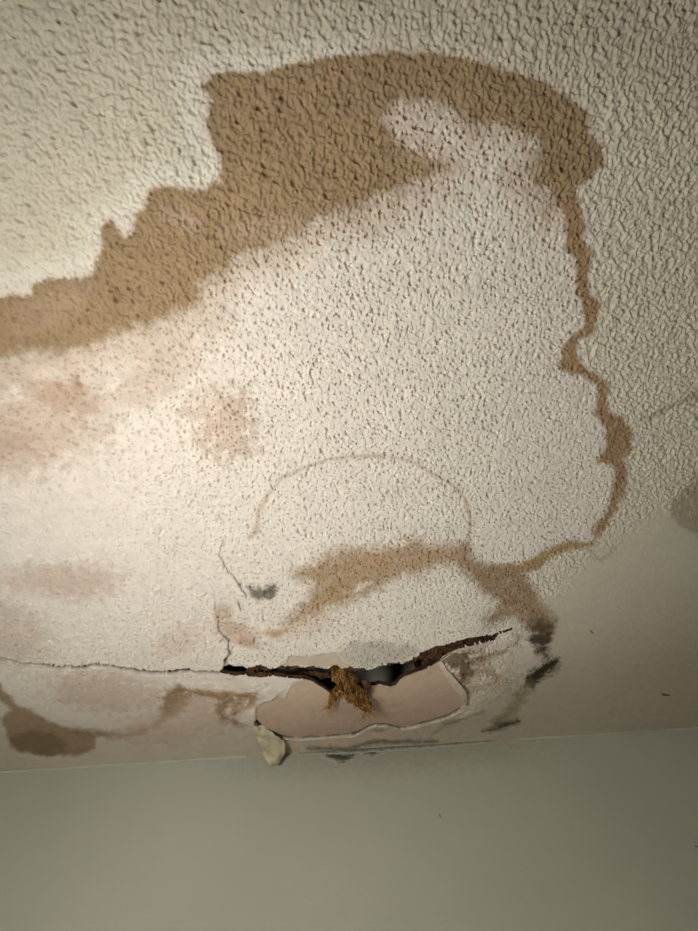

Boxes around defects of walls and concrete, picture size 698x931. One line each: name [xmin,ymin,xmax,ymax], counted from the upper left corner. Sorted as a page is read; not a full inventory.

damp [0,37,636,788]
damp [667,469,698,539]
crack [0,539,248,676]